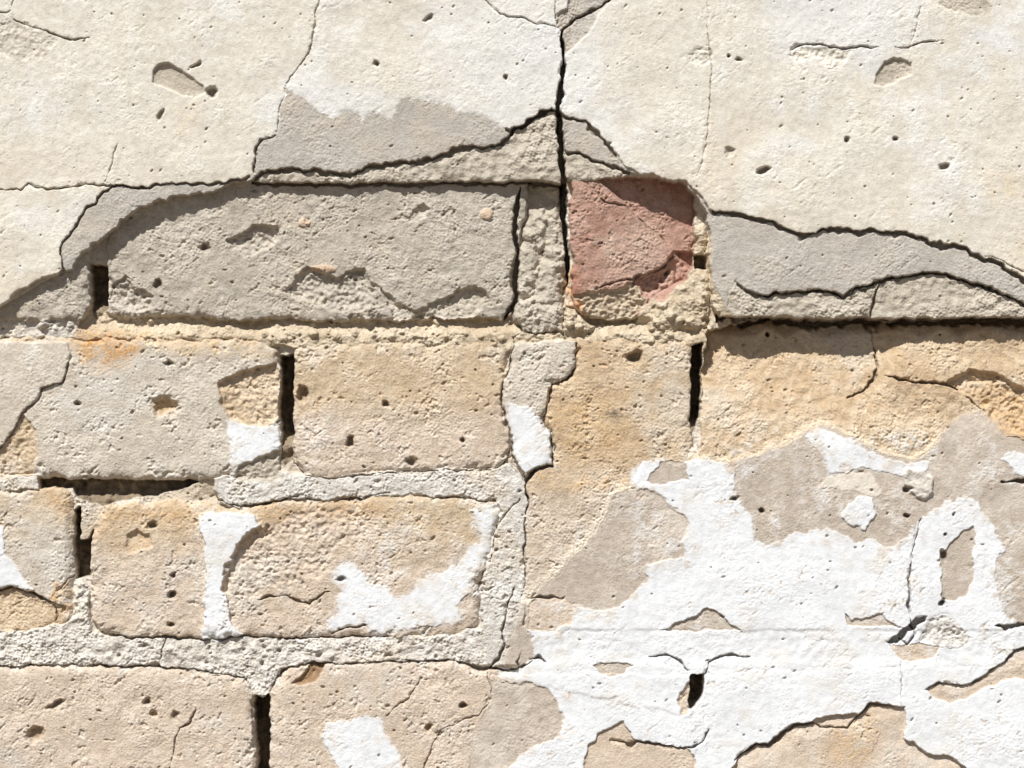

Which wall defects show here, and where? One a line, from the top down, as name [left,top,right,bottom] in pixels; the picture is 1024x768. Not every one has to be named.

crack [698,0,713,173]
crack [790,9,945,55]
peeling [57,87,1024,327]
crack [596,191,675,291]
peeling [0,342,71,480]
spalling [218,364,283,483]
crack [0,0,612,768]
peeling [507,403,554,473]
spalling [0,527,68,632]
peeling [199,502,502,639]
peeling [469,429,1024,768]
crack [735,518,1024,762]